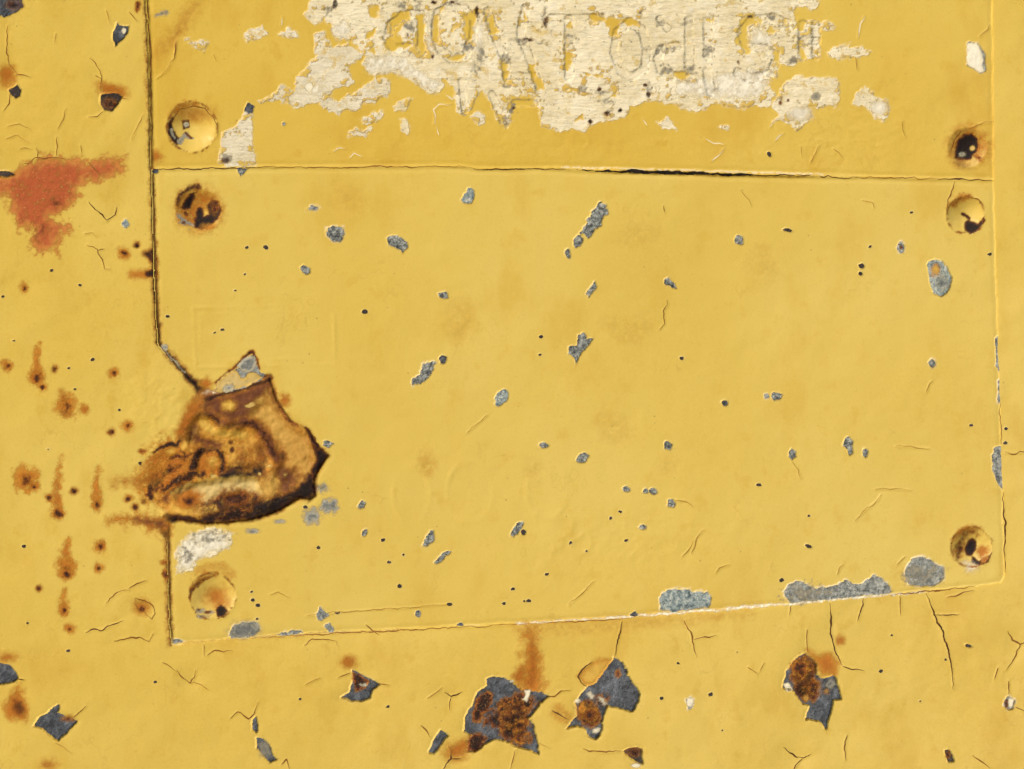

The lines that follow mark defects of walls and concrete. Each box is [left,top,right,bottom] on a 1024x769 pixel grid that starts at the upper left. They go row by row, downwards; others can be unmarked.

peeling [218,0,870,176]
corrosion [30,342,57,390]
corrosion [111,219,300,645]
corrosion [14,465,78,519]
corrosion [58,537,77,633]
peeling [174,527,232,597]
peeling [779,574,891,606]
peeling [34,704,77,740]
peeling [341,670,379,701]
corrosion [513,628,543,692]
peeling [567,657,639,739]
crack [892,586,974,686]